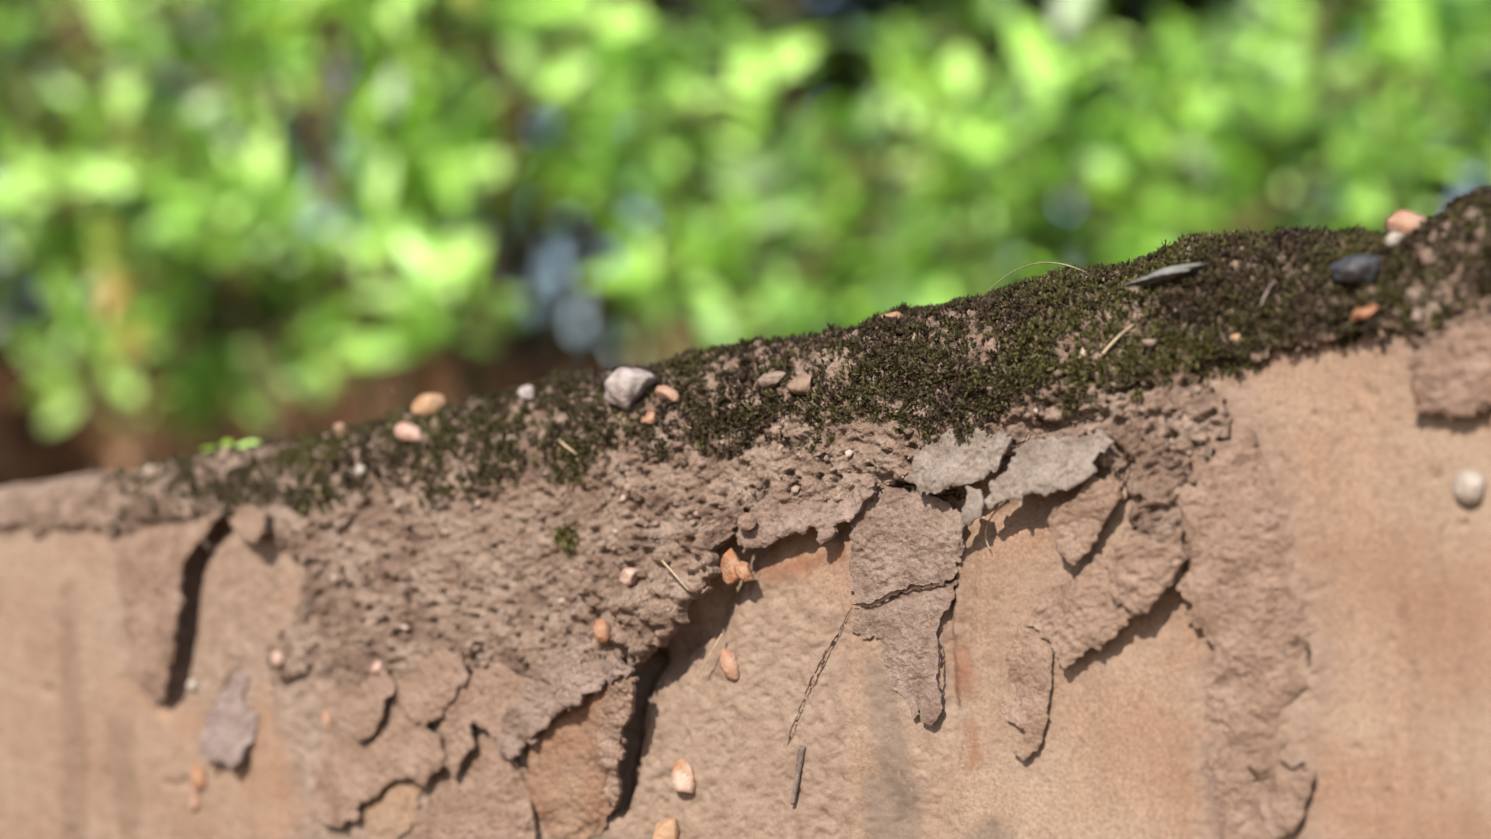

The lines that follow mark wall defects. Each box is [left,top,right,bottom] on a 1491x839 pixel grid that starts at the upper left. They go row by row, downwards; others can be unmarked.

flaking render [1406,314,1491,421]
flaking render [309,631,639,839]
crack [787,582,946,745]
flaking render [720,424,1321,839]